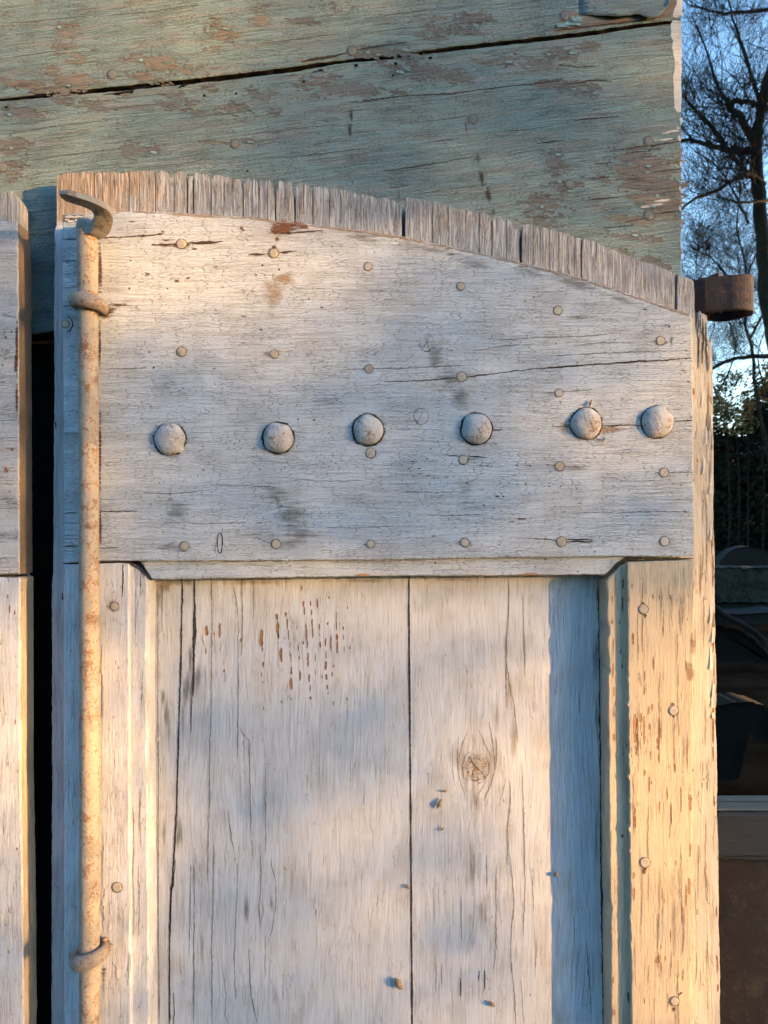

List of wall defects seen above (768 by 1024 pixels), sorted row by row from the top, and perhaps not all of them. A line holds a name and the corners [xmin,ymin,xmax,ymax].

crack [10,5,194,23]
peeling [0,21,283,121]
crack [256,7,455,62]
crack [556,19,653,31]
peeling [0,135,35,183]
corrosion [254,219,308,255]
crack [14,64,680,304]
peeling [285,0,693,270]
peeling [681,388,713,494]
peeling [275,596,351,704]
crack [329,315,715,1024]
peeling [633,657,692,825]